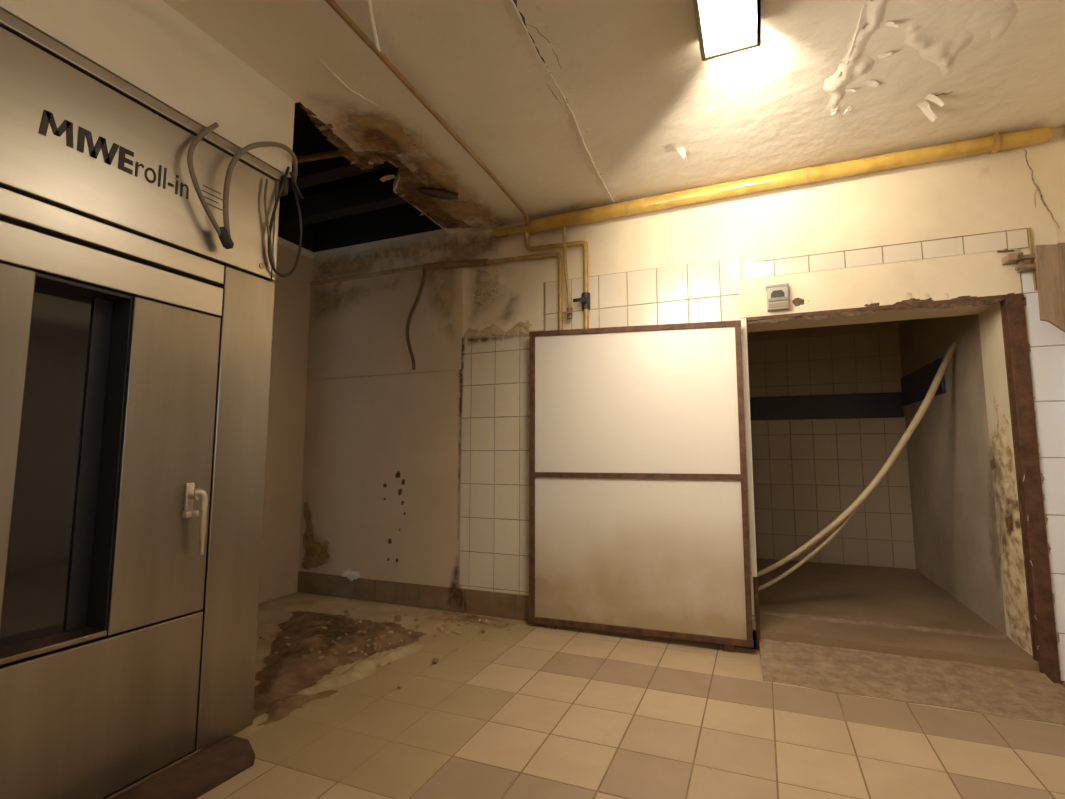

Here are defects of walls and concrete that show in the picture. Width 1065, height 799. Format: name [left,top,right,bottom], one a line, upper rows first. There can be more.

crack [503,0,615,204]
peeling [822,0,899,115]
peeling [917,92,952,122]
spalling [298,102,473,228]
damp [315,57,509,275]
crack [1023,149,1059,228]
spalling [302,502,329,570]